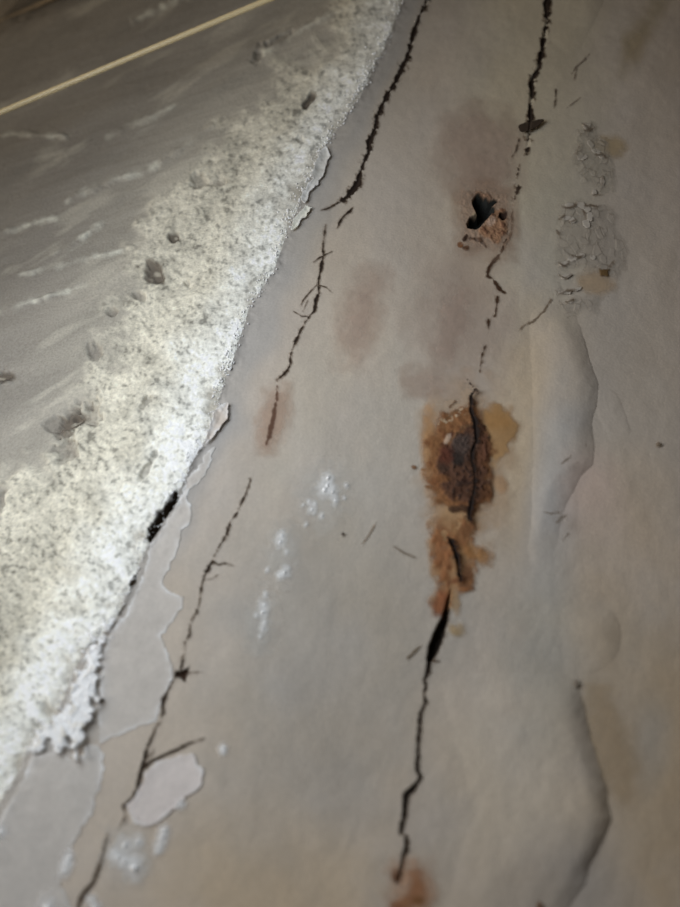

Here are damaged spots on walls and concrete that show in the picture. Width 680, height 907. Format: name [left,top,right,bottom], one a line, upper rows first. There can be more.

crack [276,0,430,381]
crack [479,0,586,372]
peeling [555,123,625,313]
peeling [0,402,229,907]
crack [77,478,251,907]
crack [396,590,451,883]
rust [411,379,518,615]